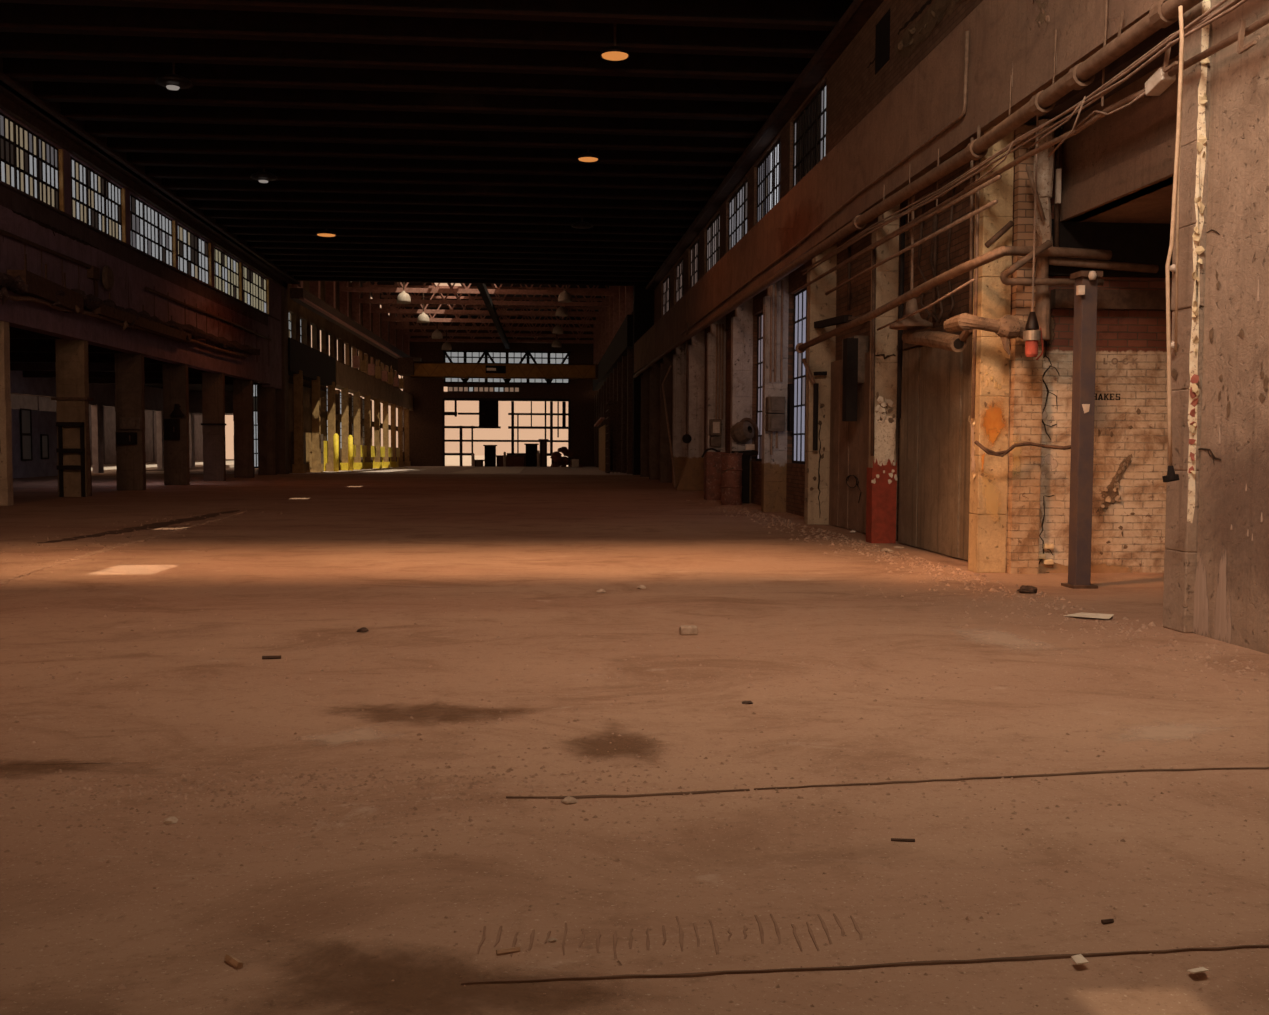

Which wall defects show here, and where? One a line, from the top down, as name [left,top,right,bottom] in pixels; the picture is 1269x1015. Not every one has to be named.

peeling [1171,0,1213,523]
peeling [871,392,897,484]
corrosion [981,404,1006,471]
spalling [1096,454,1132,516]
leakage [1193,552,1231,644]